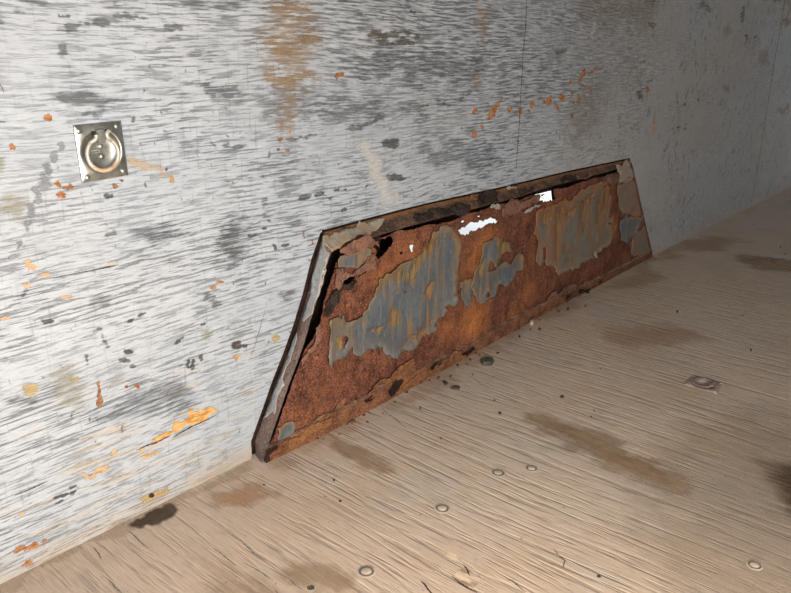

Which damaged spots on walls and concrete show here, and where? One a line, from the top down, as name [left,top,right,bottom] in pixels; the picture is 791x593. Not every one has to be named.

peeling [472,65,604,139]
water stain [738,255,791,272]
peeling [81,449,117,480]
peeling [139,407,217,460]
water stain [526,413,689,493]